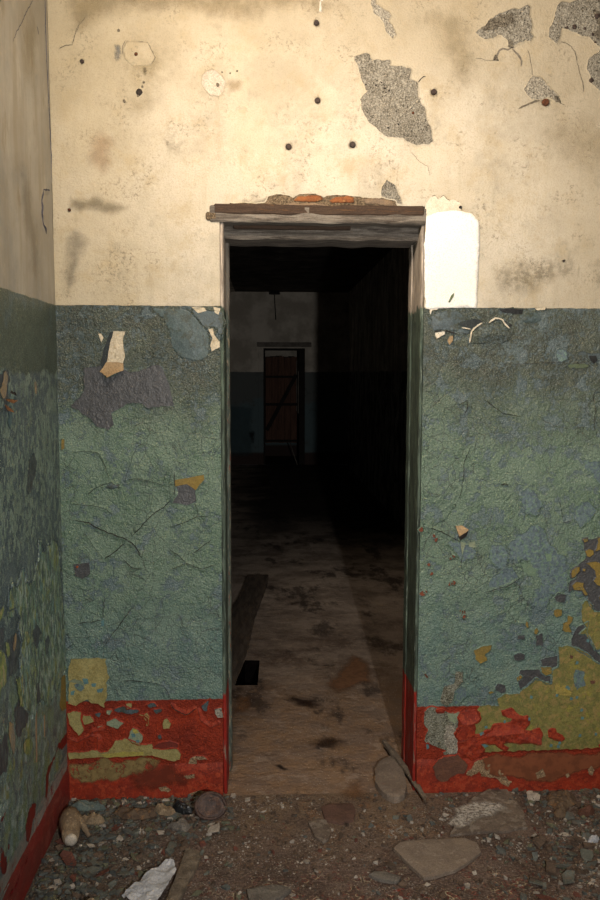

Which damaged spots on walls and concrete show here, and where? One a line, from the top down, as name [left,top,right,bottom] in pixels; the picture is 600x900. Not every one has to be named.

spalling [353,52,434,147]
spalling [474,4,564,109]
spalling [547,0,600,93]
peeling [70,330,175,431]
crack [72,441,217,573]
peeling [417,524,478,569]
crack [77,597,134,648]
peeling [0,538,220,842]
peeling [200,698,224,719]
peeling [422,537,600,800]